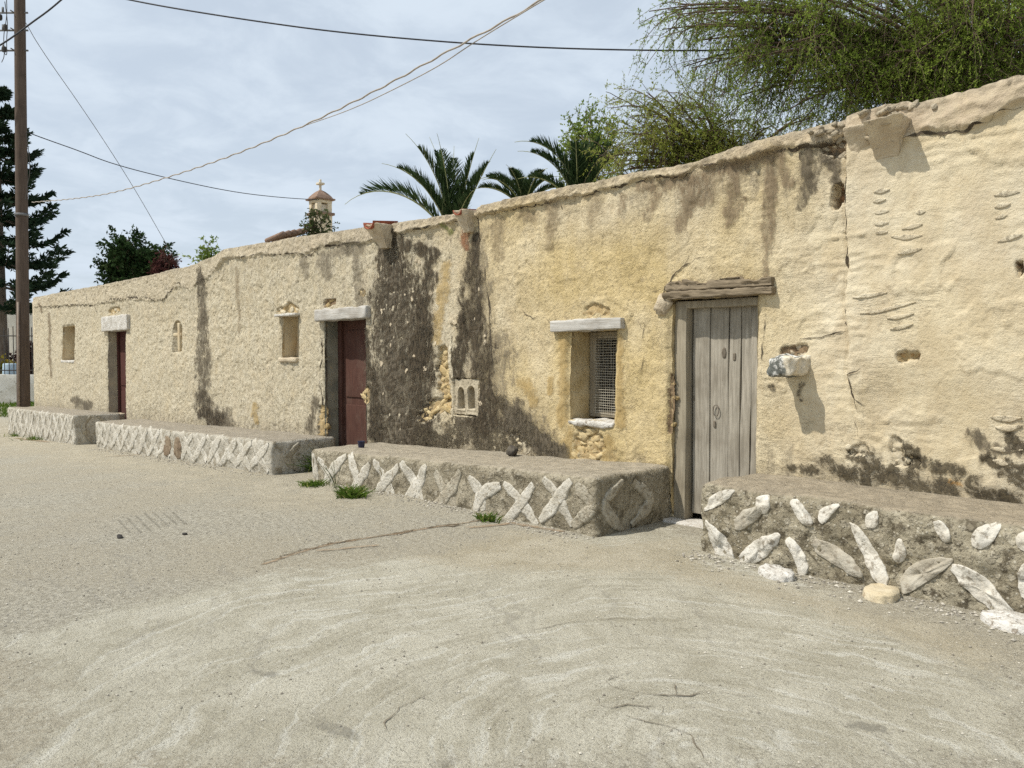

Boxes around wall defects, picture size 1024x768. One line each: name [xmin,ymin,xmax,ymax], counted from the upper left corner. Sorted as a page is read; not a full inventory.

water stain [618,139,842,278]
crack [843,178,851,287]
water stain [194,267,235,427]
spalling [419,341,452,422]
water stain [364,228,578,459]
spalling [571,419,604,461]
water stain [615,335,626,429]
crack [847,364,865,436]
water stain [786,428,1024,504]
hole [897,352,921,362]